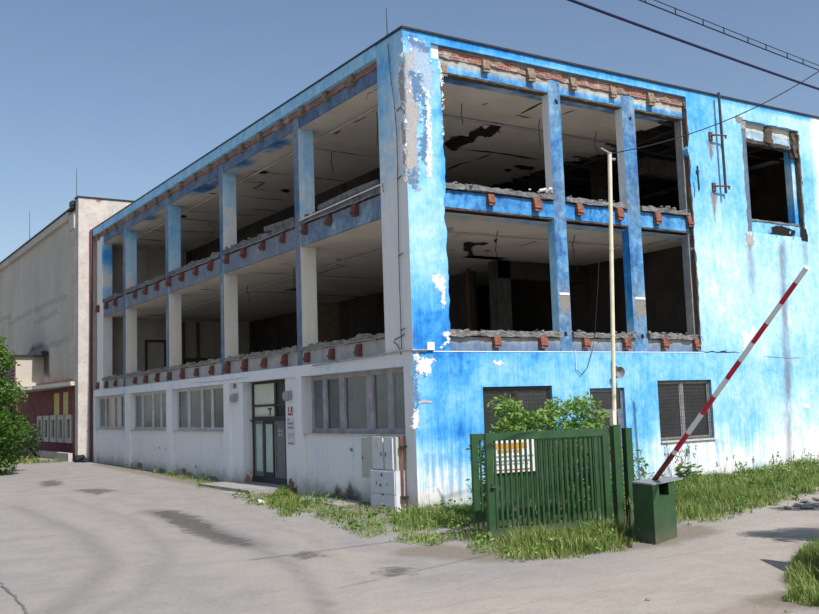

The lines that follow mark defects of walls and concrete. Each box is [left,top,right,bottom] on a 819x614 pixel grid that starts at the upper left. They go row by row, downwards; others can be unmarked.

peeling [398,34,621,191]
spalling [463,239,498,256]
peeling [431,274,447,308]
spalling [635,297,646,321]
spalling [440,329,703,349]
peeling [741,327,756,351]
peeling [410,351,435,429]